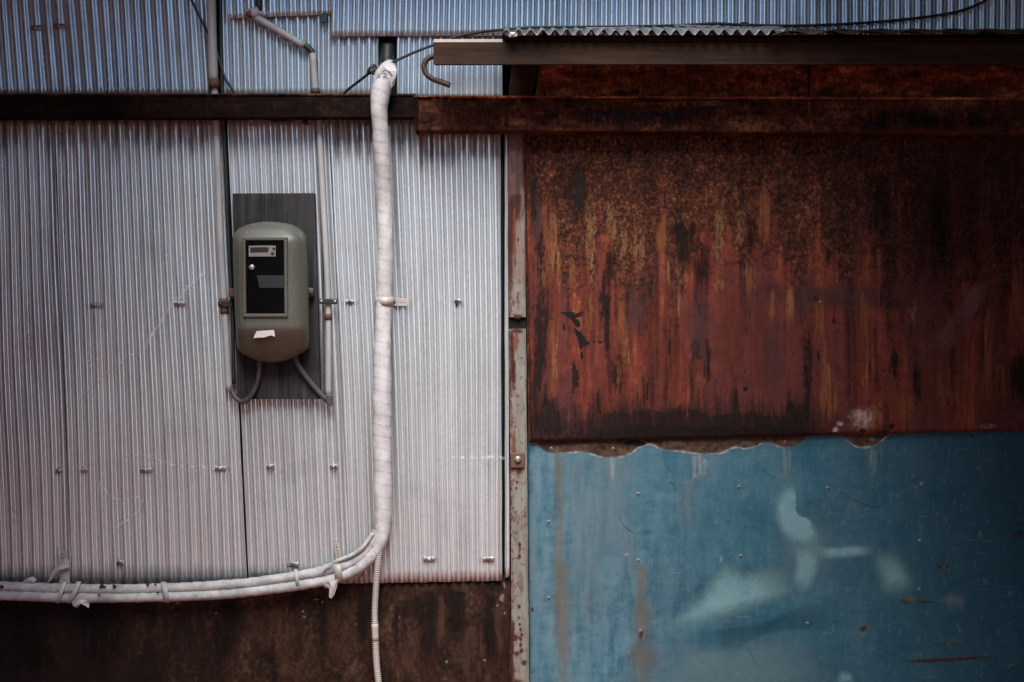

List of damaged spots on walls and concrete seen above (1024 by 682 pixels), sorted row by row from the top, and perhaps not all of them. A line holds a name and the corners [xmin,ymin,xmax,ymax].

rust [508,194,521,282]
rust [533,203,575,289]
rust [585,203,681,337]
rust [757,191,770,241]
rust [510,292,522,382]
rust [549,326,558,393]
peeling [538,436,805,459]
rust [494,602,534,682]